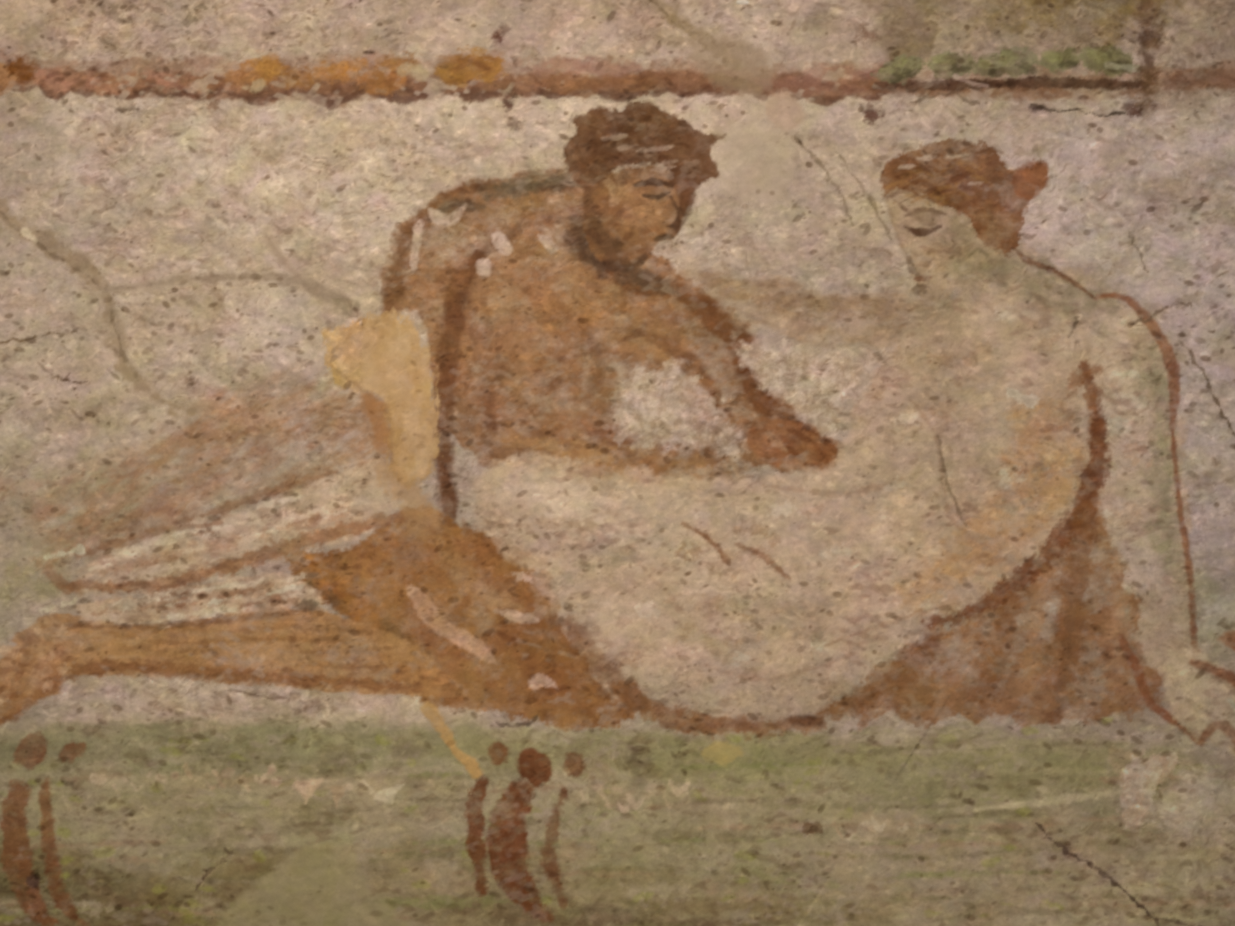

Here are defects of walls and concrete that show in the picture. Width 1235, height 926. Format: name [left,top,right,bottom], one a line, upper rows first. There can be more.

crack [0,195,351,420]
crack [1033,817,1203,926]